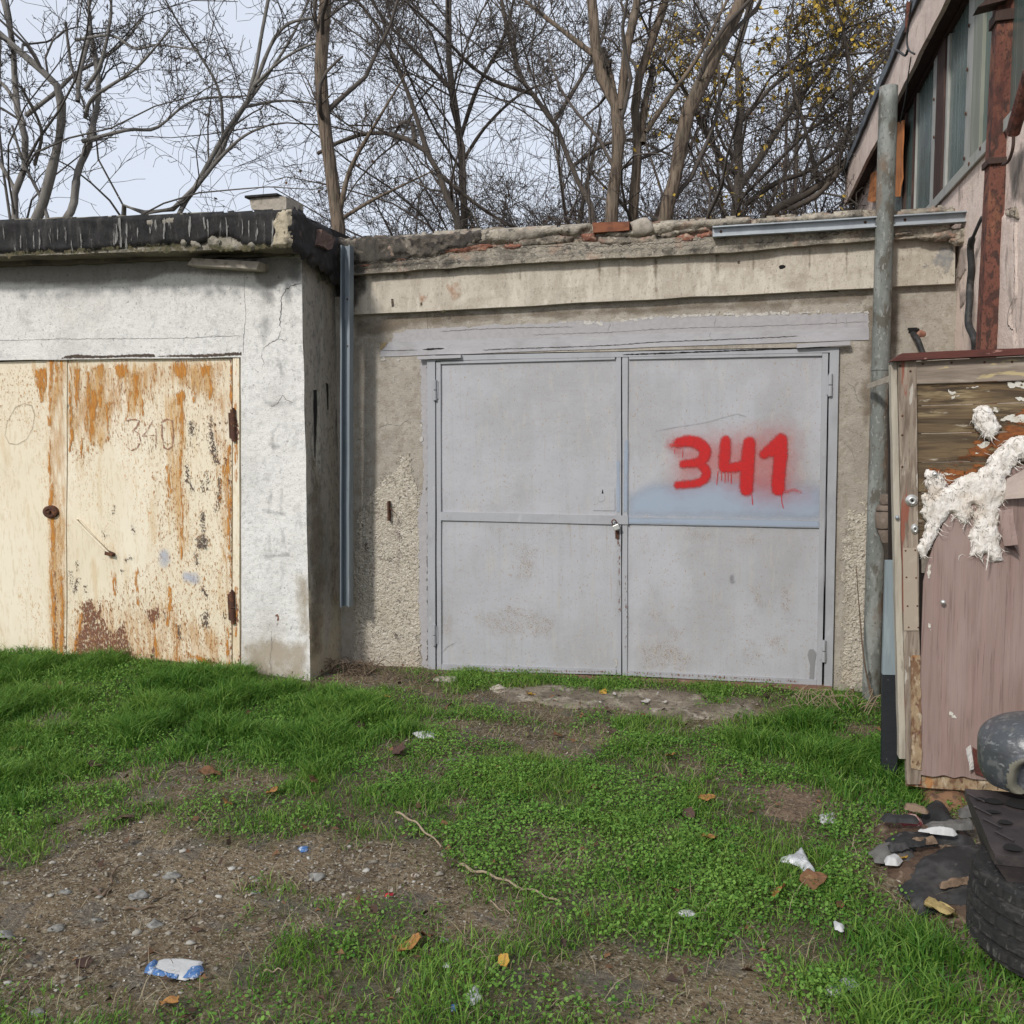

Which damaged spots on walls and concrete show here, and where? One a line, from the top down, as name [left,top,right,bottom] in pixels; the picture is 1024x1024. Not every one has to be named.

spalling [271,209,293,248]
spalling [440,226,713,254]
crack [0,274,302,366]
corrosion [0,360,241,667]
spalling [351,450,422,668]